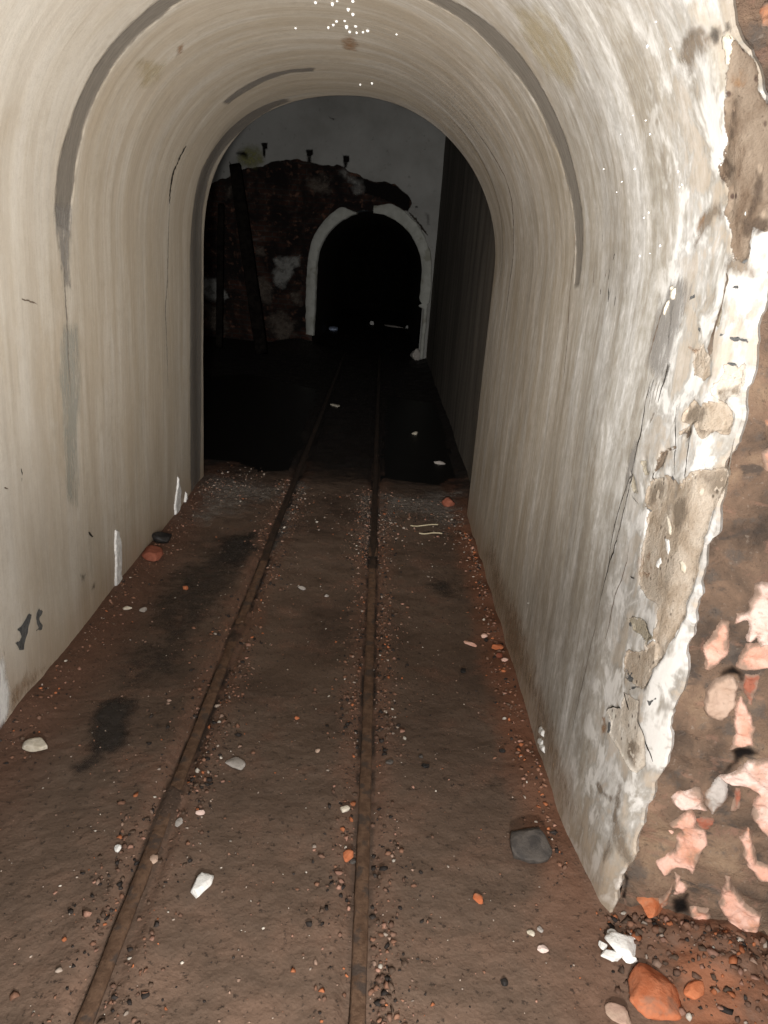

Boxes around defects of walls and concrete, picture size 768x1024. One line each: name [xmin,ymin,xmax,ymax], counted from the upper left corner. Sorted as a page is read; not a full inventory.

flaking render [718,35,768,263]
crack [572,279,690,734]
flaking render [602,344,746,773]
spalling [656,581,768,908]
spalling [689,875,762,933]